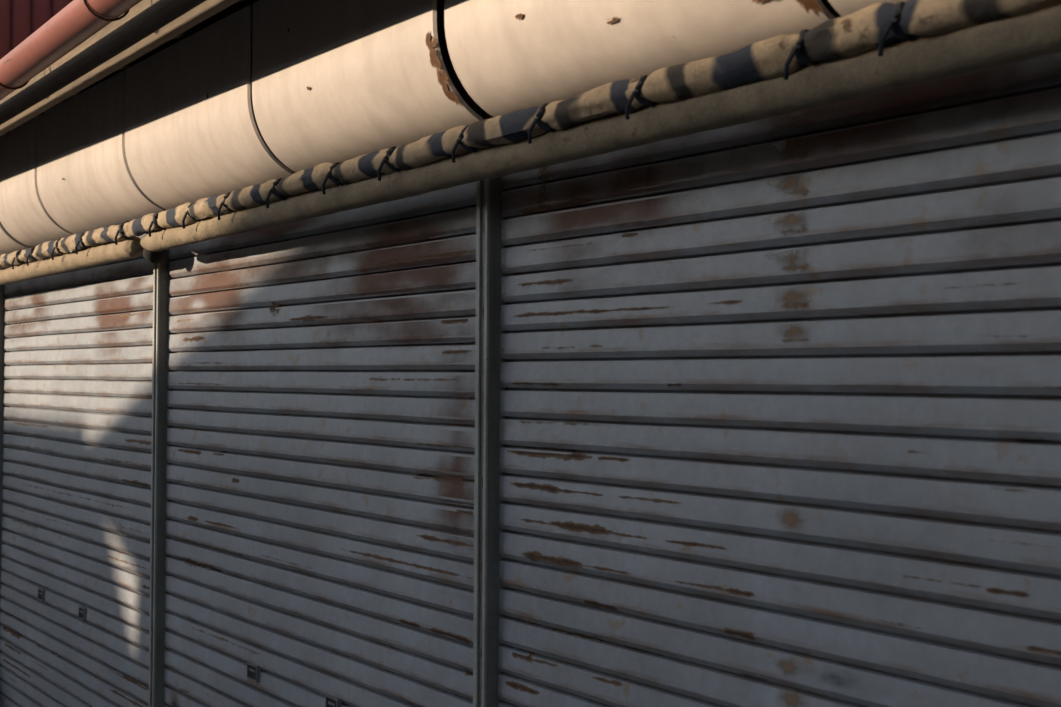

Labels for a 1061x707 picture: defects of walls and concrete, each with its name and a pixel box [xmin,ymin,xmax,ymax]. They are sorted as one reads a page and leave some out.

rust [796,0,822,13]
rust [425,32,459,105]
rust [522,163,673,247]
rust [345,223,473,338]
rust [176,263,244,323]
rust [515,307,666,317]
rust [508,447,629,462]
rust [513,482,602,496]
rust [521,519,646,539]
rust [666,540,725,550]
rust [523,551,630,574]
rust [904,576,1029,597]